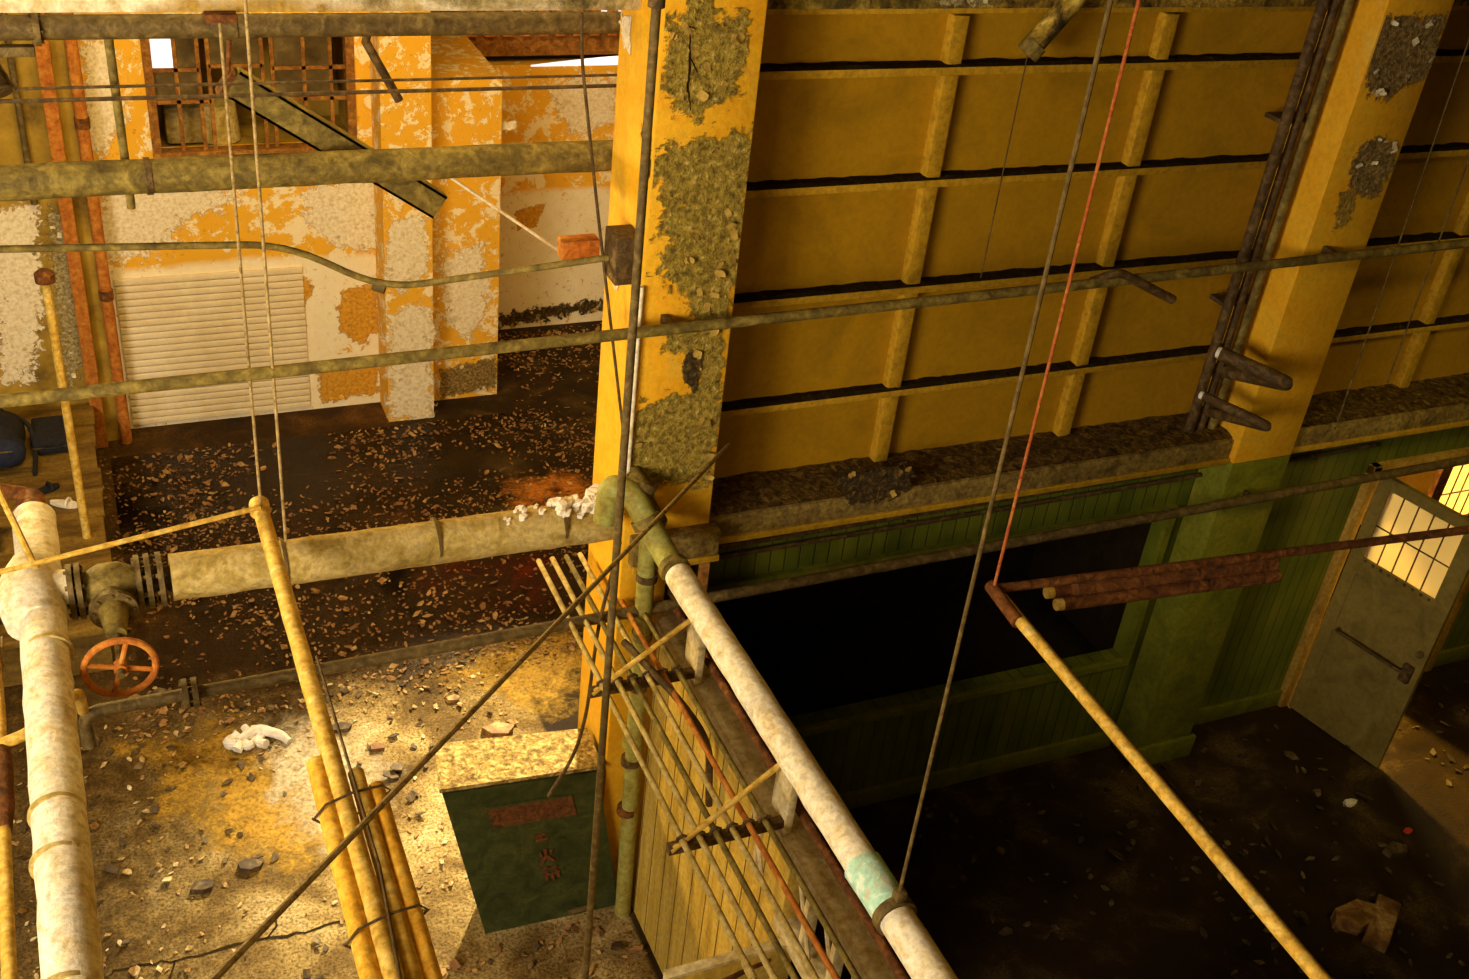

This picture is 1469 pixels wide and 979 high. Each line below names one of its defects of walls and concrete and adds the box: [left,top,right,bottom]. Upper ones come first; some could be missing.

damp [446,0,639,11]
peeling [1365,12,1449,104]
peeling [501,120,516,133]
peeling [541,69,617,140]
spalling [1331,135,1398,232]
peeling [99,190,252,270]
peeling [631,0,753,492]
spalling [0,201,83,391]
peeling [300,183,618,423]